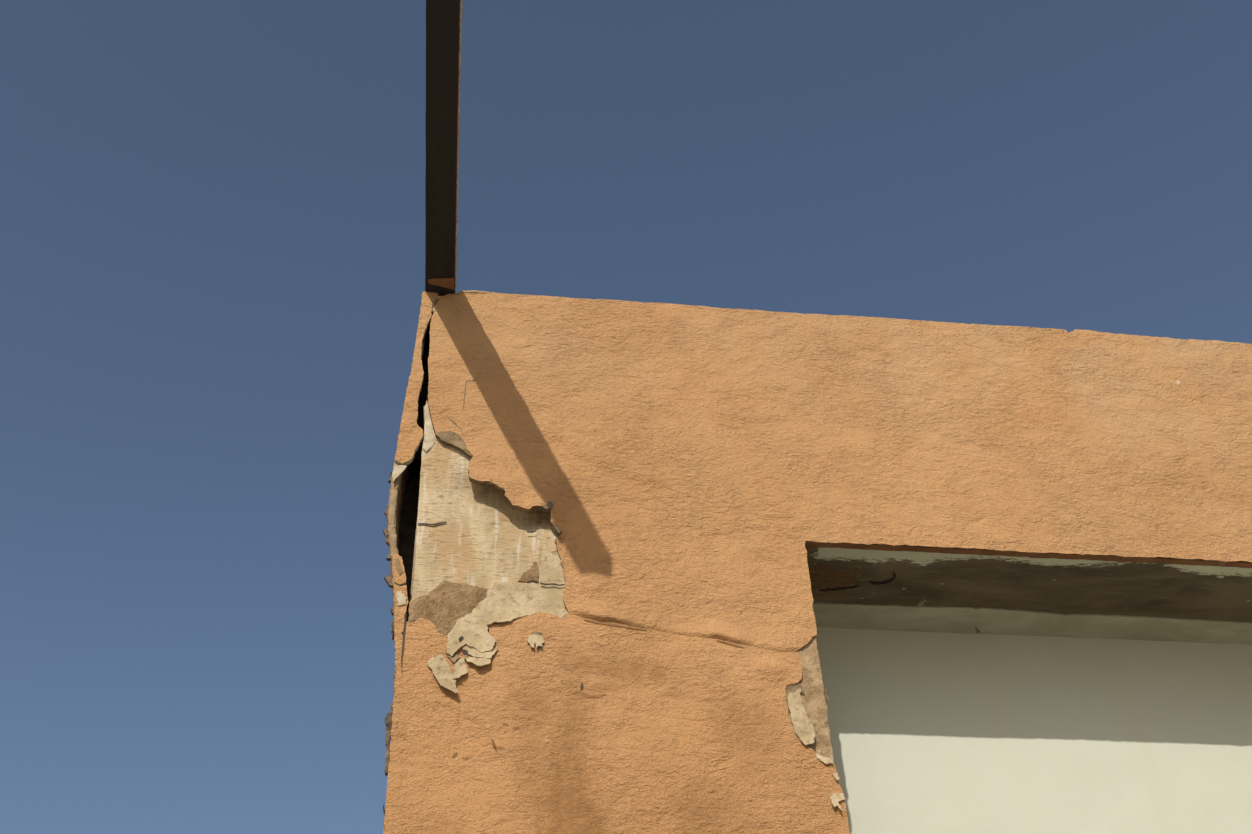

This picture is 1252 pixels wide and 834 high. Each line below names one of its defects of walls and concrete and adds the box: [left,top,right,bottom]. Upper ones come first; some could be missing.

crack [392,346,476,667]
flaking render [408,402,568,694]
flaking render [385,702,393,776]
flaking render [785,637,846,812]